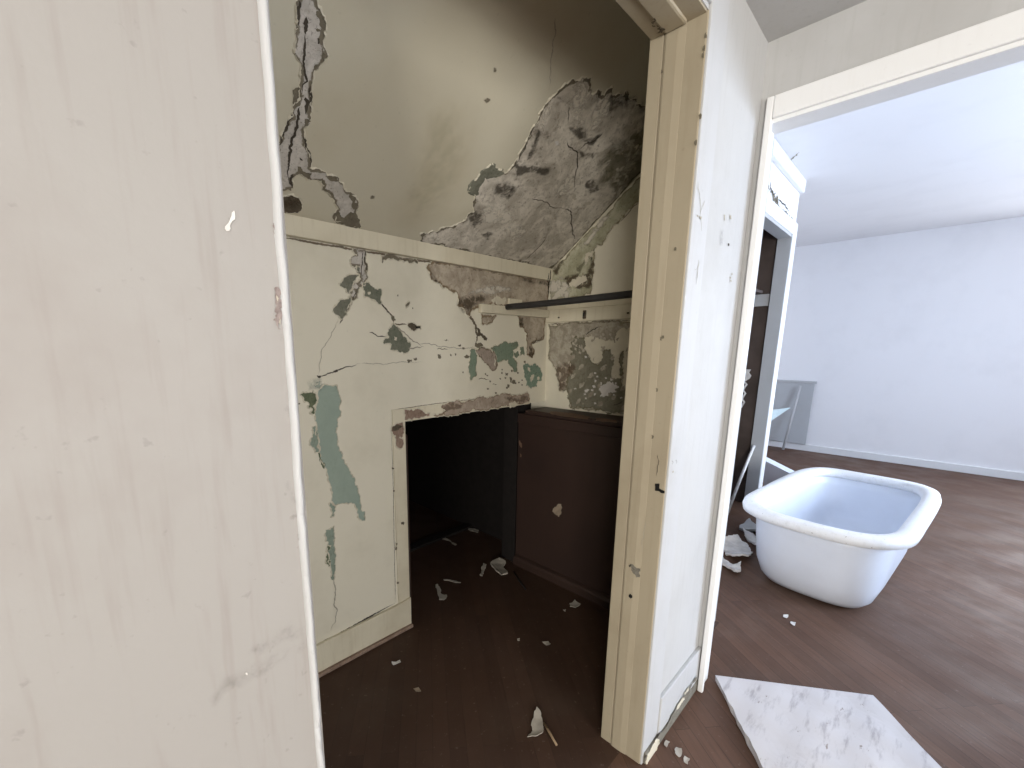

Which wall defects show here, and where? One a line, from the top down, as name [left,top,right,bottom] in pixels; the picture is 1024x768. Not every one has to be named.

flaking render [279,0,362,229]
crack [317,304,487,378]
flaking render [381,76,646,450]
peeling [298,381,366,626]